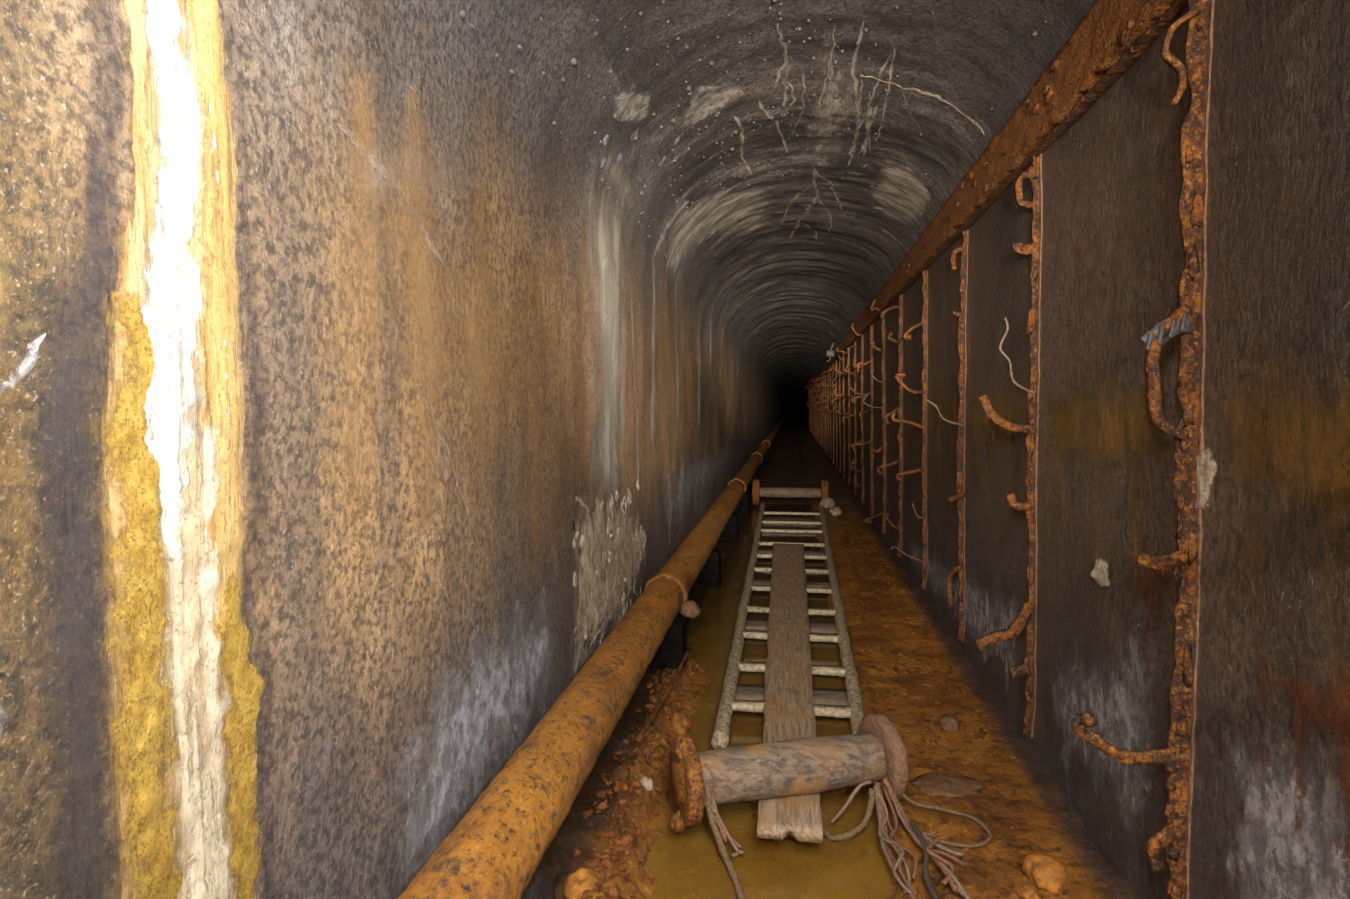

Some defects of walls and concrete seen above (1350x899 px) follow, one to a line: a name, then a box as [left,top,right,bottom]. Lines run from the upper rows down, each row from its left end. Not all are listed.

crack [859,75,985,134]
crack [777,165,846,241]
leakage [45,0,272,899]
leakage [572,82,803,674]
rust [1024,384,1035,488]
rust [1026,306,1036,335]
rust [1172,371,1198,587]
leakage [1228,763,1350,899]